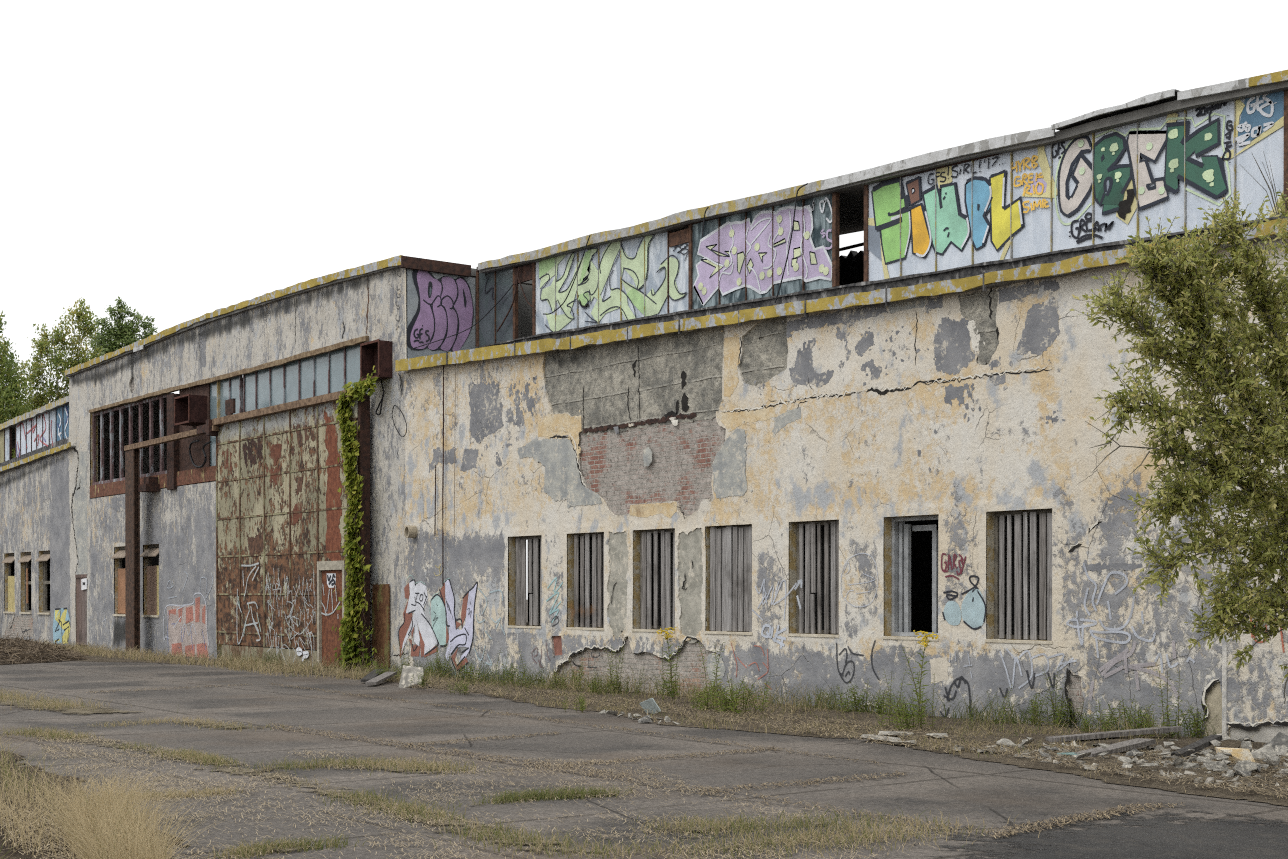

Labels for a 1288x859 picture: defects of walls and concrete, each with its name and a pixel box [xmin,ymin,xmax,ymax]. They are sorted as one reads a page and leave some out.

crack [723,288,1053,413]
flaking render [429,280,1060,696]
crack [531,582,700,683]
flaking render [1204,682,1288,743]